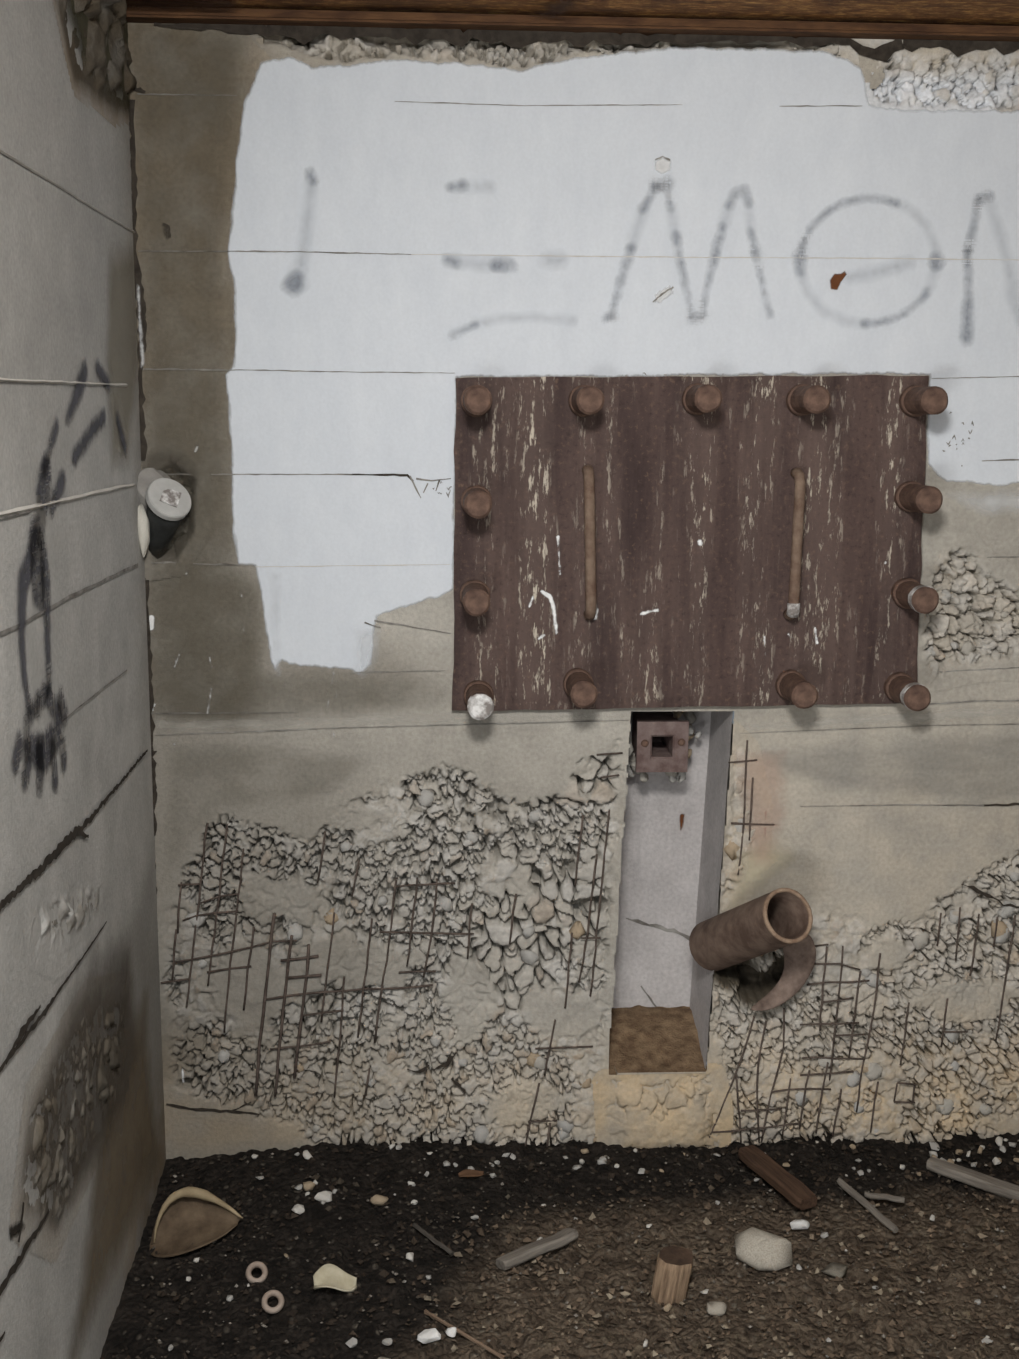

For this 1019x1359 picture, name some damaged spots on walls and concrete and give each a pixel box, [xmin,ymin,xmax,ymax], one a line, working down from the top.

spalling [250,34,1019,113]
spalling [723,740,774,875]
crack [801,801,1019,809]
spalling [161,823,474,1098]
spalling [427,809,619,1178]
spalling [705,944,883,1157]
spalling [899,1002,910,1065]
spalling [940,998,968,1047]
spalling [955,901,1016,1041]
spalling [893,1081,917,1103]
spalling [10,1202,24,1243]